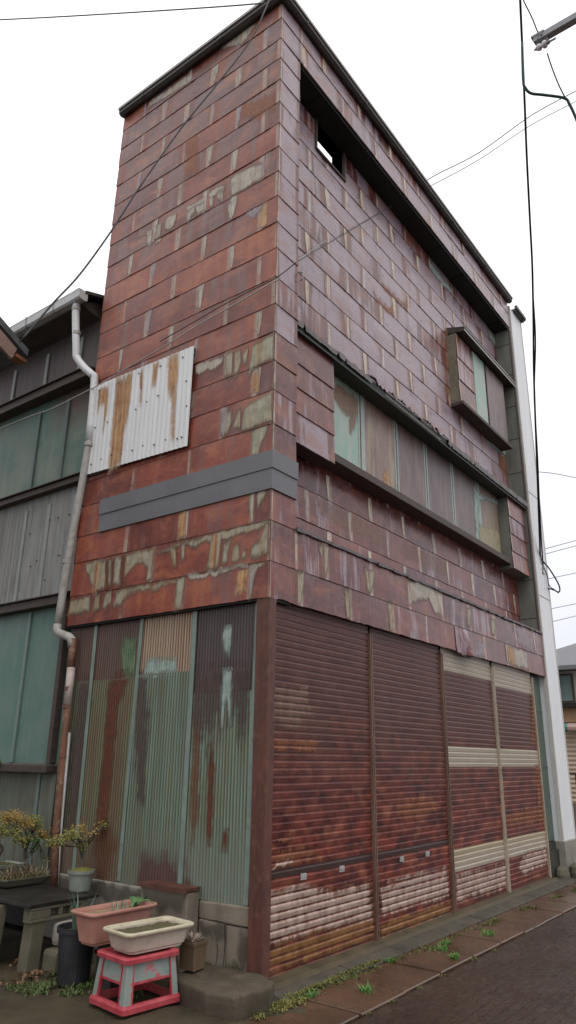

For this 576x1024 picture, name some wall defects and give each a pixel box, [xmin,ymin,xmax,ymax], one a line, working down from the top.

peeling [139,164,263,246]
peeling [195,334,274,377]
rust [98,354,178,470]
peeling [220,392,273,455]
peeling [67,519,269,617]
peeling [474,487,501,553]
rust [67,680,89,830]
rust [94,669,148,880]
rust [190,663,251,847]
rust [272,830,322,865]